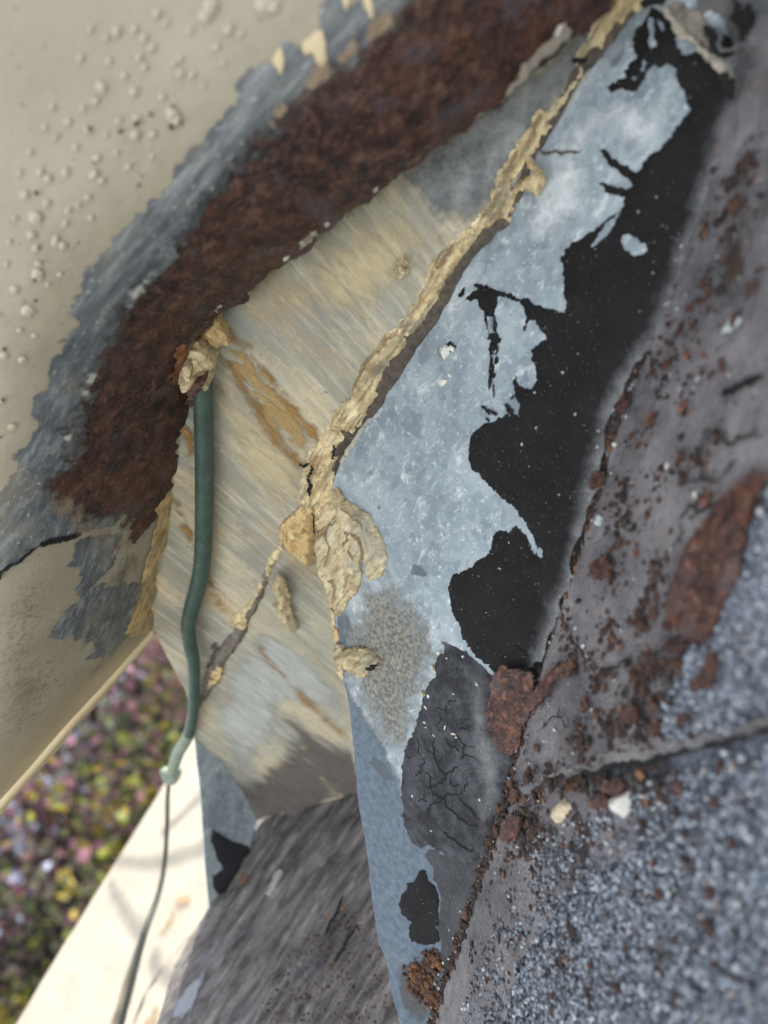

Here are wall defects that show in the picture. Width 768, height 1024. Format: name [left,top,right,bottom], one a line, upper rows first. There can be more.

peeling [648,17,664,48]
peeling [591,213,647,256]
corrosion [45,0,613,544]
peeling [0,0,416,677]
corrosion [615,394,630,414]
corrosion [589,557,615,580]
corrosion [664,472,765,692]
corrosion [484,664,535,755]
corrosion [675,714,694,726]
crack [406,700,495,853]
corrosion [500,778,522,843]
corrosion [600,776,626,796]